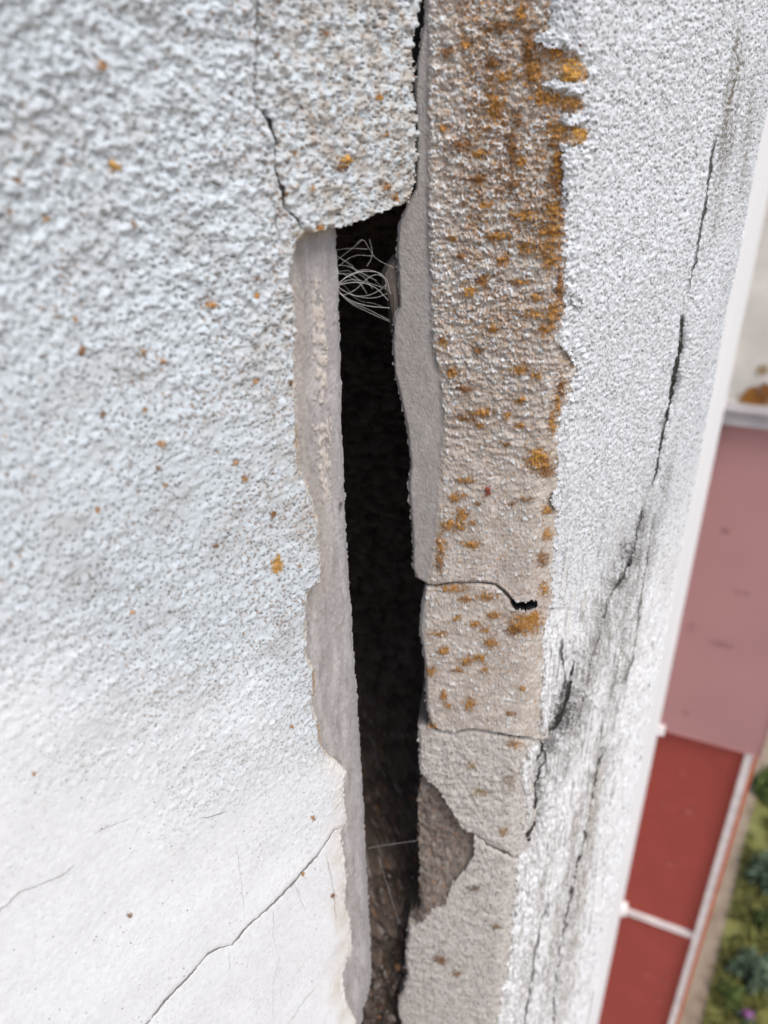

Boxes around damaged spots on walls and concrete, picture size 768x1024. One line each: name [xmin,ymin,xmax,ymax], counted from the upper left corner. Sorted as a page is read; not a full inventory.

crack [253,0,302,235]
rust [438,0,590,338]
crack [689,140,717,288]
rust [455,393,526,430]
rust [547,371,567,436]
crack [652,317,685,484]
crack [335,0,511,1024]
rust [435,476,491,573]
rust [426,581,552,677]
crack [478,513,654,858]
crack [147,828,339,1024]
spalling [409,774,474,922]